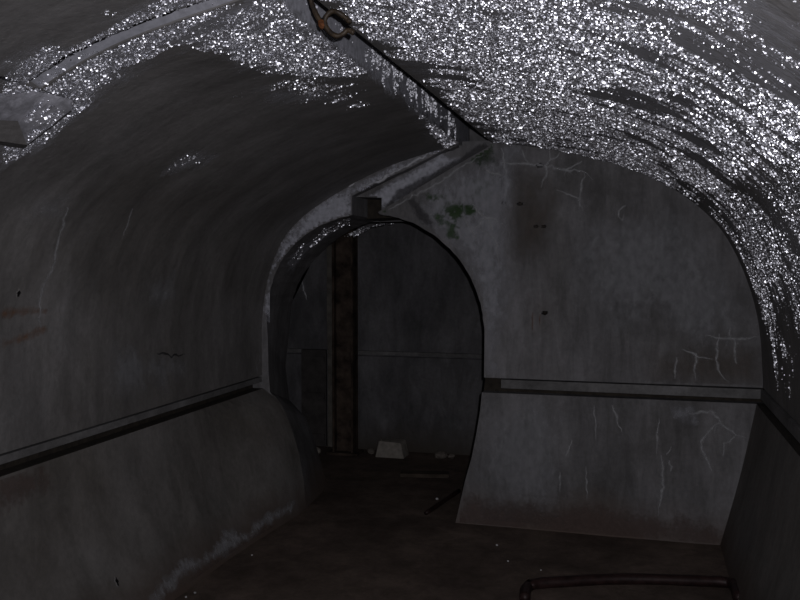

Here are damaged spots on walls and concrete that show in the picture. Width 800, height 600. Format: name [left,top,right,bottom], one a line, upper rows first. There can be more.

crack [486,148,585,193]
damp [274,145,509,328]
crack [674,331,755,380]